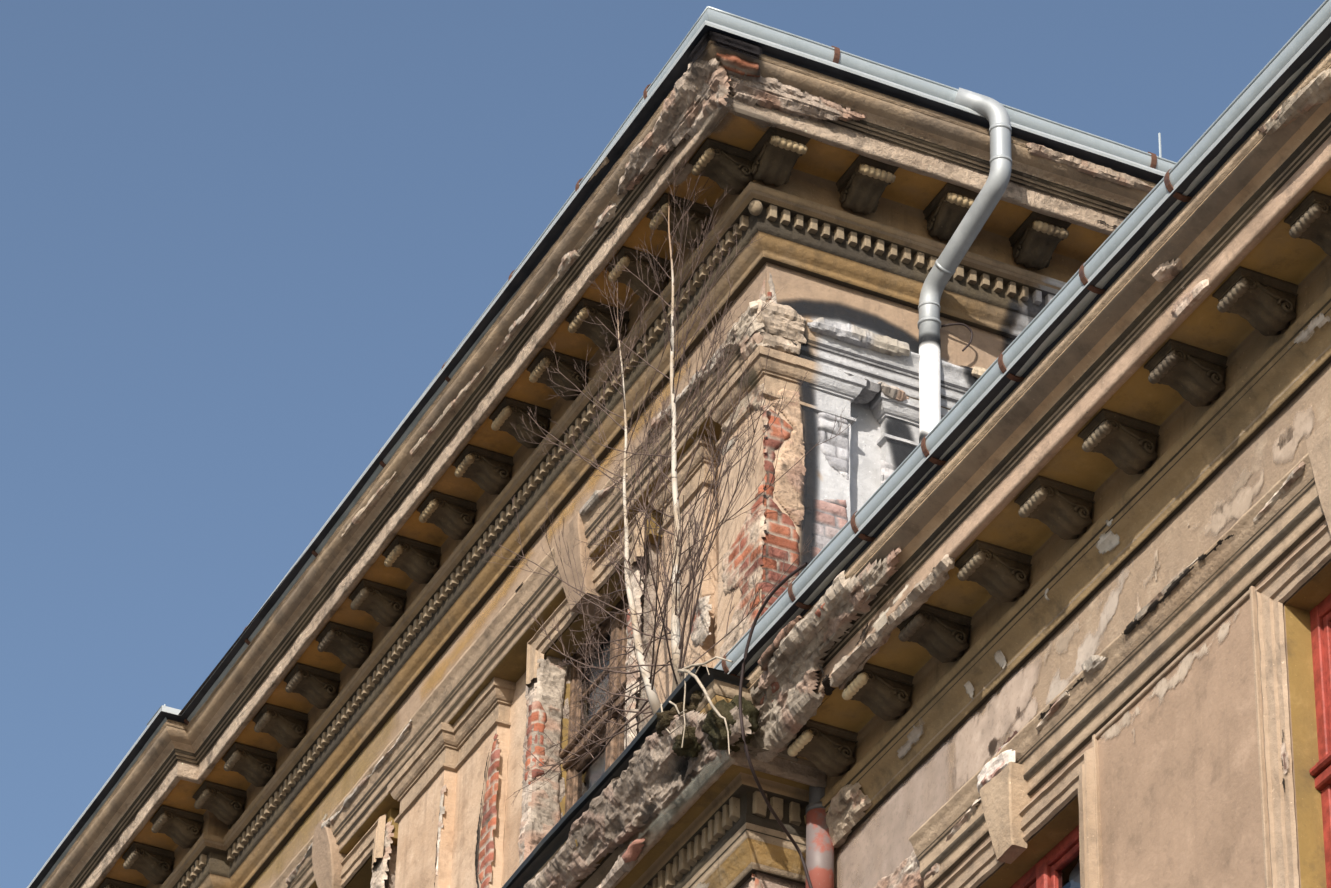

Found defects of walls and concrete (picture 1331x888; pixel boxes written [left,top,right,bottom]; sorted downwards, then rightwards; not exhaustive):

spalling [495,32,867,352]
spalling [370,821,394,888]
crack [434,785,446,887]
flaking render [475,734,500,888]
spalling [518,658,568,866]
spalling [624,556,645,750]
flaking render [691,383,849,665]
peeling [825,554,1128,888]
crack [1039,677,1085,720]
crack [1123,534,1234,635]
peeling [1151,613,1238,700]
peeling [1205,407,1313,535]